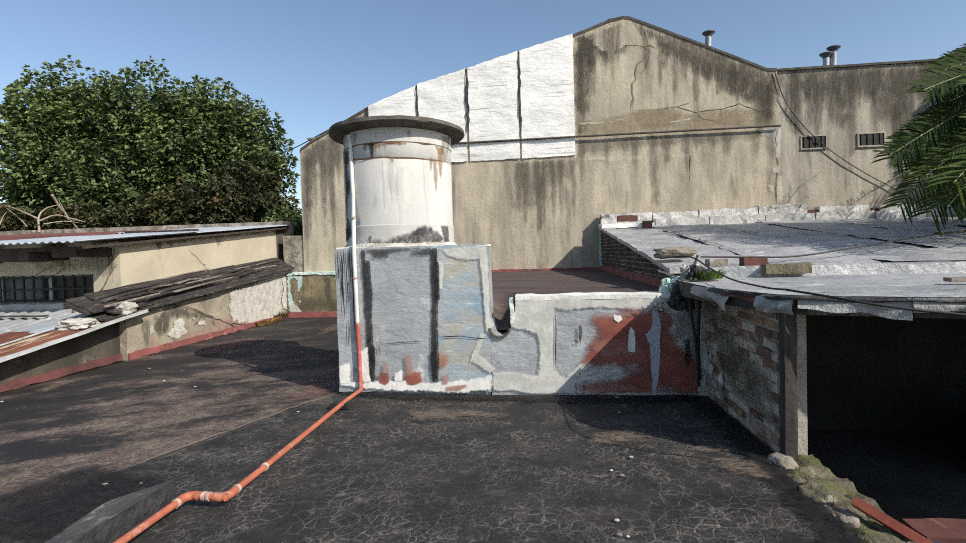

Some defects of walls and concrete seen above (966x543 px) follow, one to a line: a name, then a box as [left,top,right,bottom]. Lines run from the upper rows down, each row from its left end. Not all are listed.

crack [626,45,781,201]
damp [640,26,955,126]
flaking render [167,274,302,339]